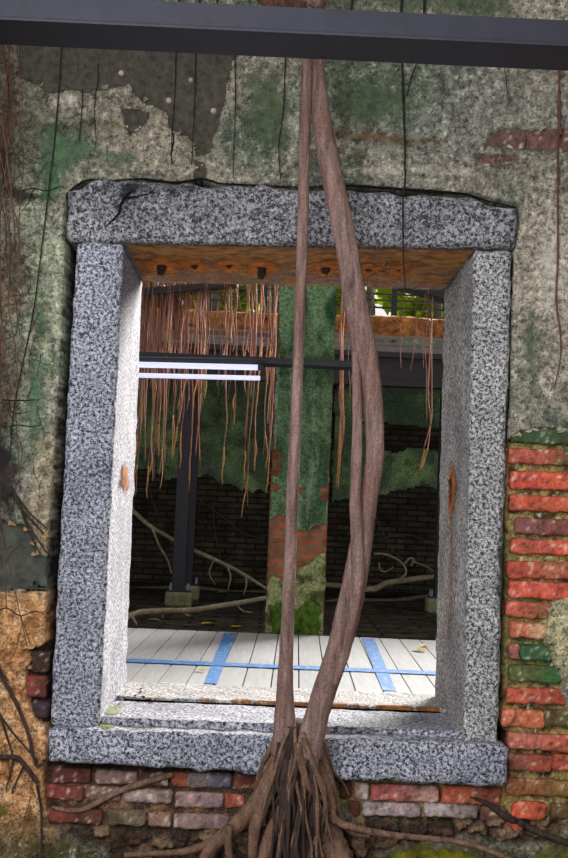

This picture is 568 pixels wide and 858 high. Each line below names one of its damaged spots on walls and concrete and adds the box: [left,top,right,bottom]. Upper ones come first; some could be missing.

flaking render [481,126,568,166]
crack [19,130,323,227]
crack [345,184,517,208]
peeling [382,387,440,428]
rust [121,464,129,491]
rust [448,462,456,520]
flaking render [339,427,568,831]
flaking render [26,646,53,718]